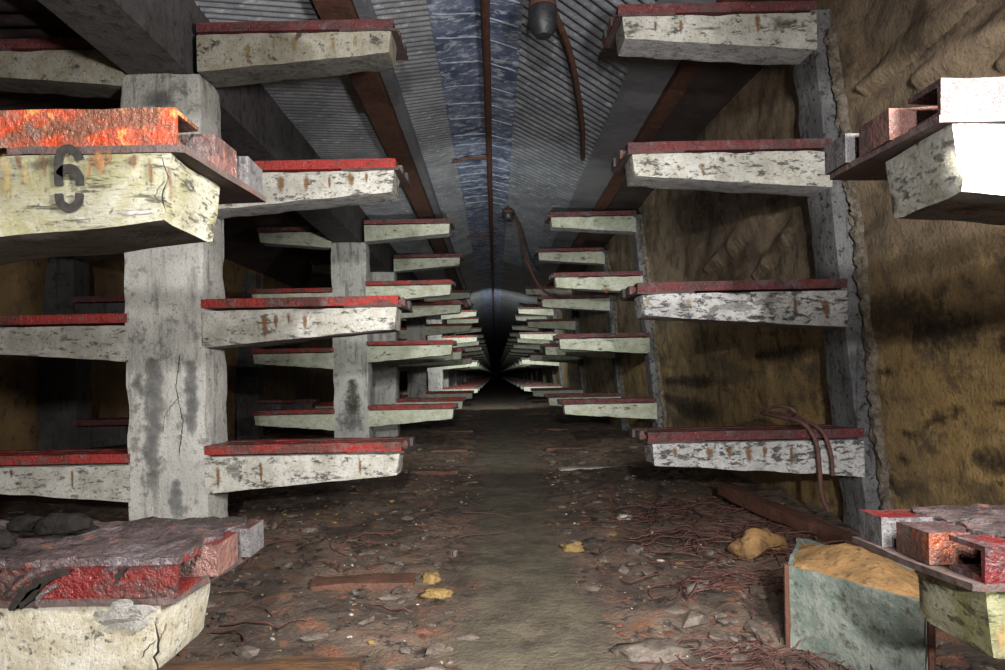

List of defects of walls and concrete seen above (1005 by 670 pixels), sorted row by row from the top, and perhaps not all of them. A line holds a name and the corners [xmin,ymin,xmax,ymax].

damp [151,93,170,107]
rust [87,151,112,178]
damp [870,290,979,348]
damp [186,361,197,430]
damp [134,358,164,484]
damp [973,450,1005,486]
damp [169,481,182,514]
spalling [92,599,157,631]